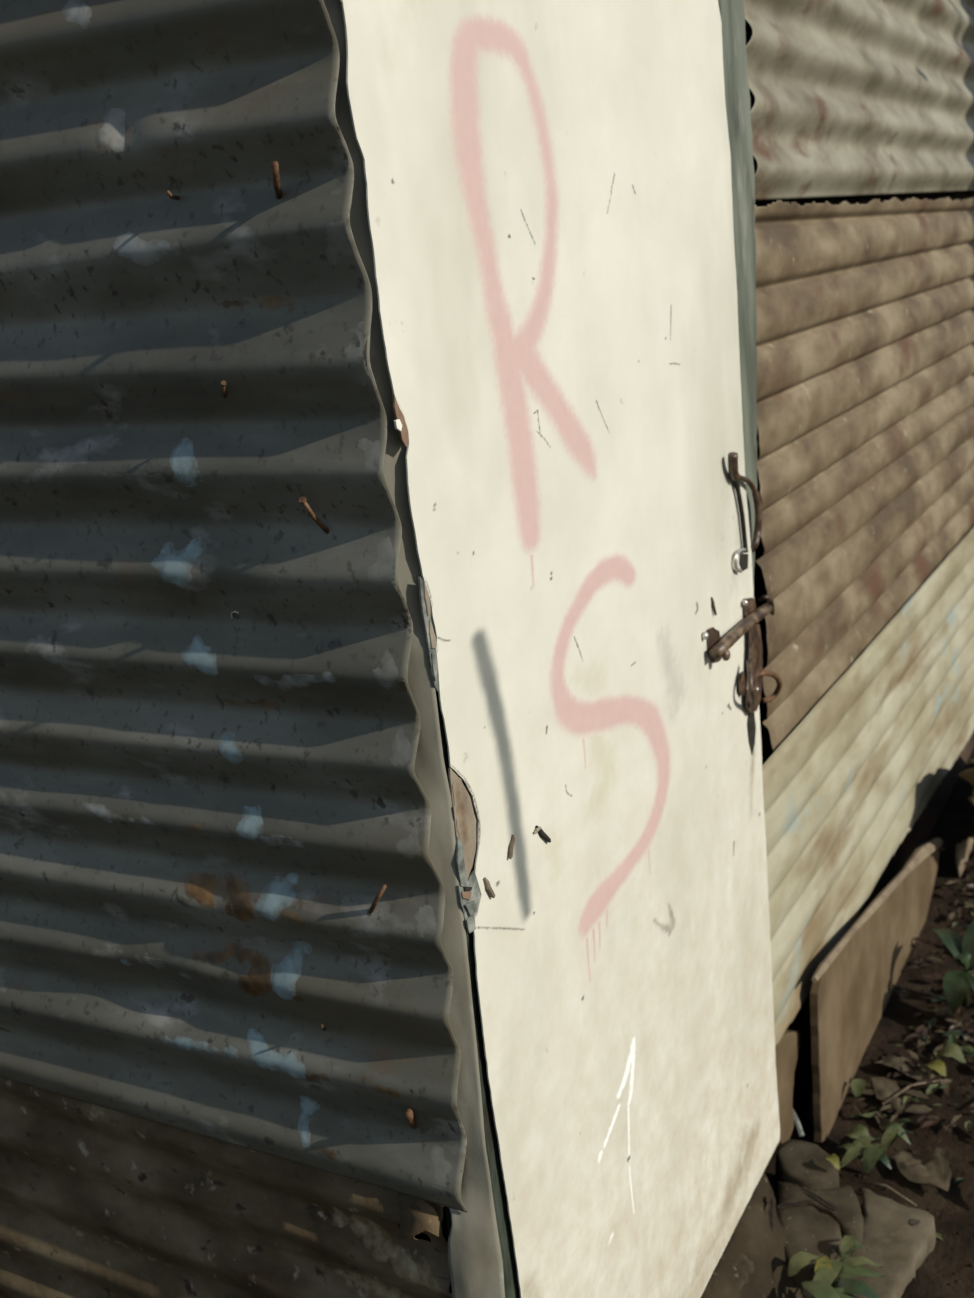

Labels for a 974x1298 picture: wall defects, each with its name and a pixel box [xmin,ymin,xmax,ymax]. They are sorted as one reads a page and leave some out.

peeling [448,763,482,933]
corrosion [185,872,256,923]
corrosion [192,942,272,997]